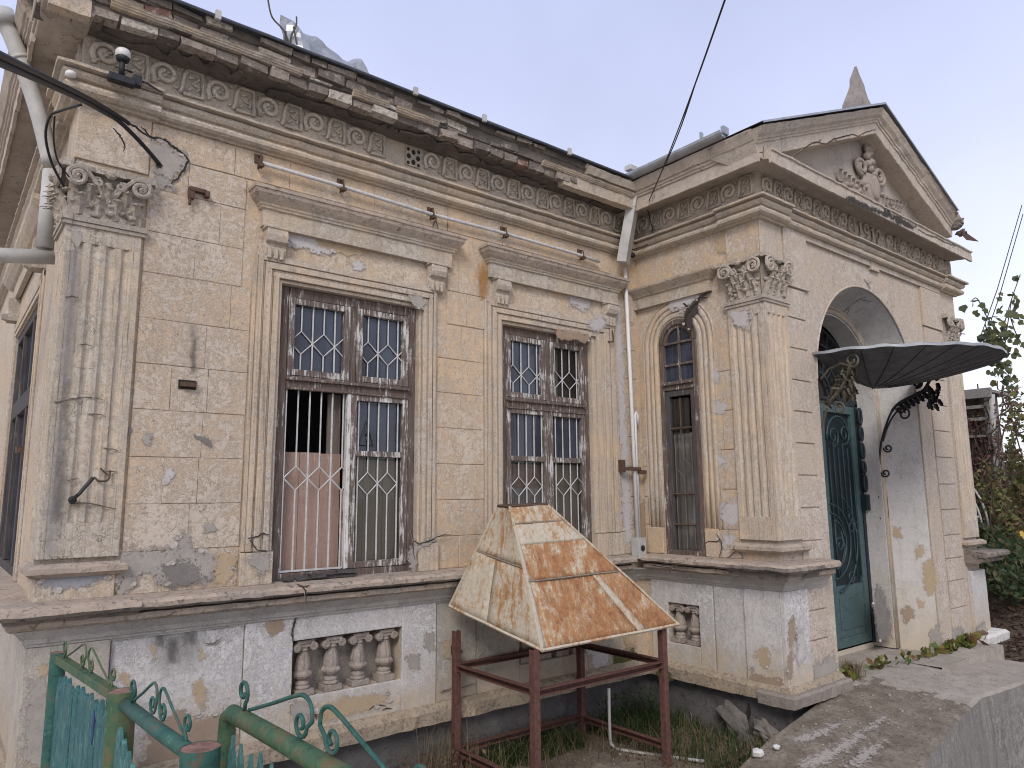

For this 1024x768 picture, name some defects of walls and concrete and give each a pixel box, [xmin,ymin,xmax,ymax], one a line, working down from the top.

flaking render [91,0,577,184]
peeling [138,134,192,193]
crack [792,129,874,157]
peeling [287,233,369,272]
peeling [555,296,635,546]
peeling [37,522,271,596]
crack [410,530,451,559]
peeling [871,545,939,644]
peeling [749,615,797,687]